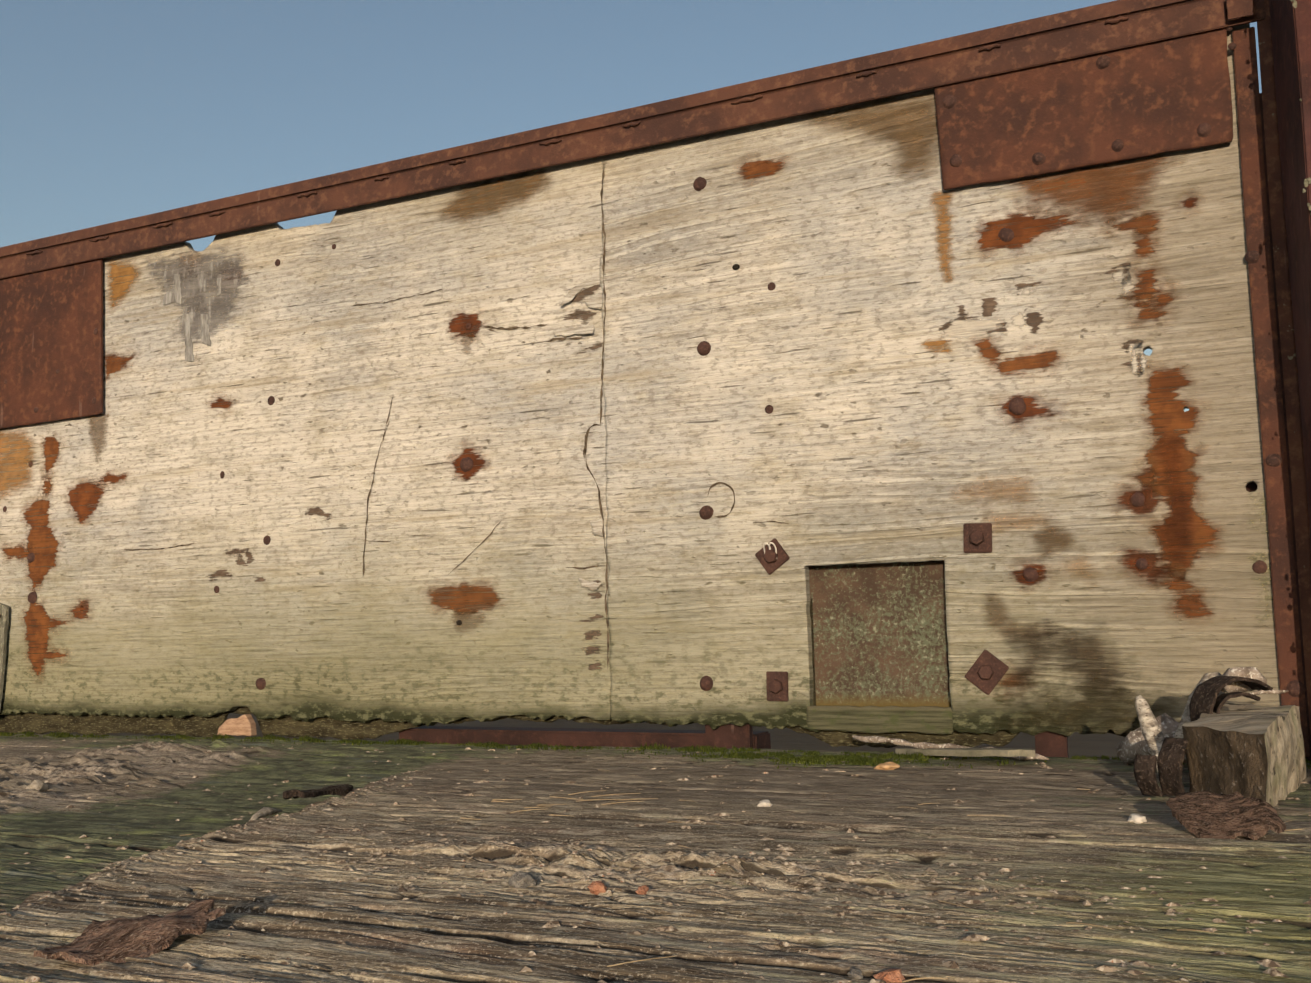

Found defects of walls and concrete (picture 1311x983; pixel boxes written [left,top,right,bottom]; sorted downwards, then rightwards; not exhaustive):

corrosion [738,159,784,179]
corrosion [931,192,953,282]
corrosion [978,158,1176,321]
corrosion [448,313,482,338]
corrosion [975,339,1061,375]
corrosion [68,473,127,524]
crack [353,397,393,575]
corrosion [451,448,486,481]
crack [484,170,623,669]
corrosion [1117,368,1220,618]
corrosion [2,437,89,676]
corrosion [428,583,500,615]